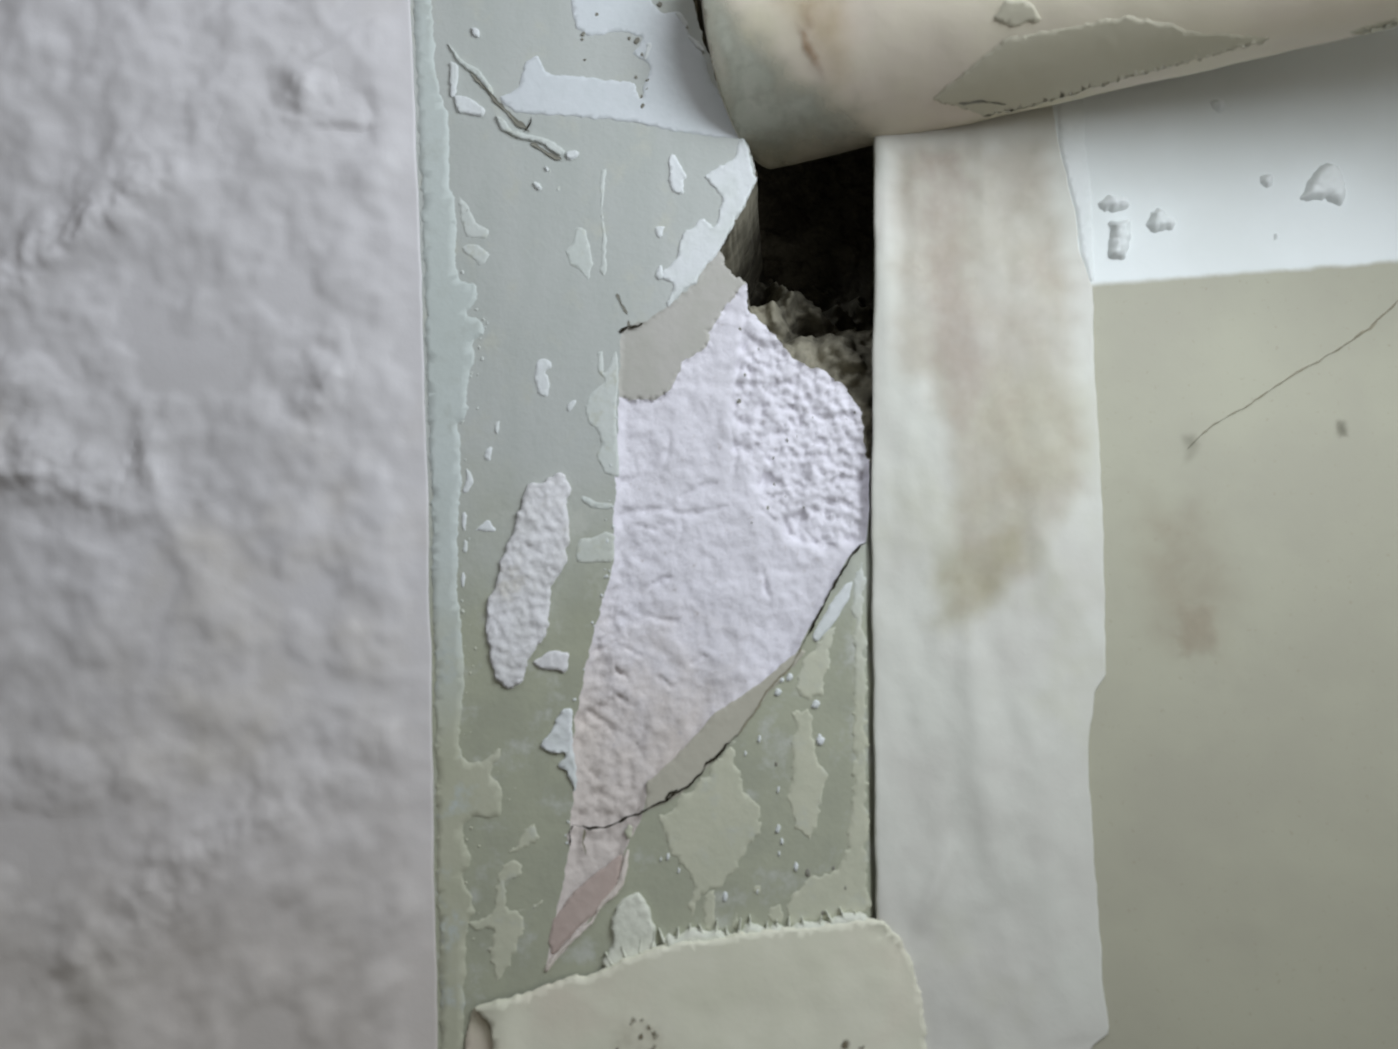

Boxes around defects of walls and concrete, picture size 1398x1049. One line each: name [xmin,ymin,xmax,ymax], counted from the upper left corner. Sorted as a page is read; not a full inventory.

peeling [933,0,1269,117]
crack [1187,302,1397,449]
flaking render [413,0,874,1049]